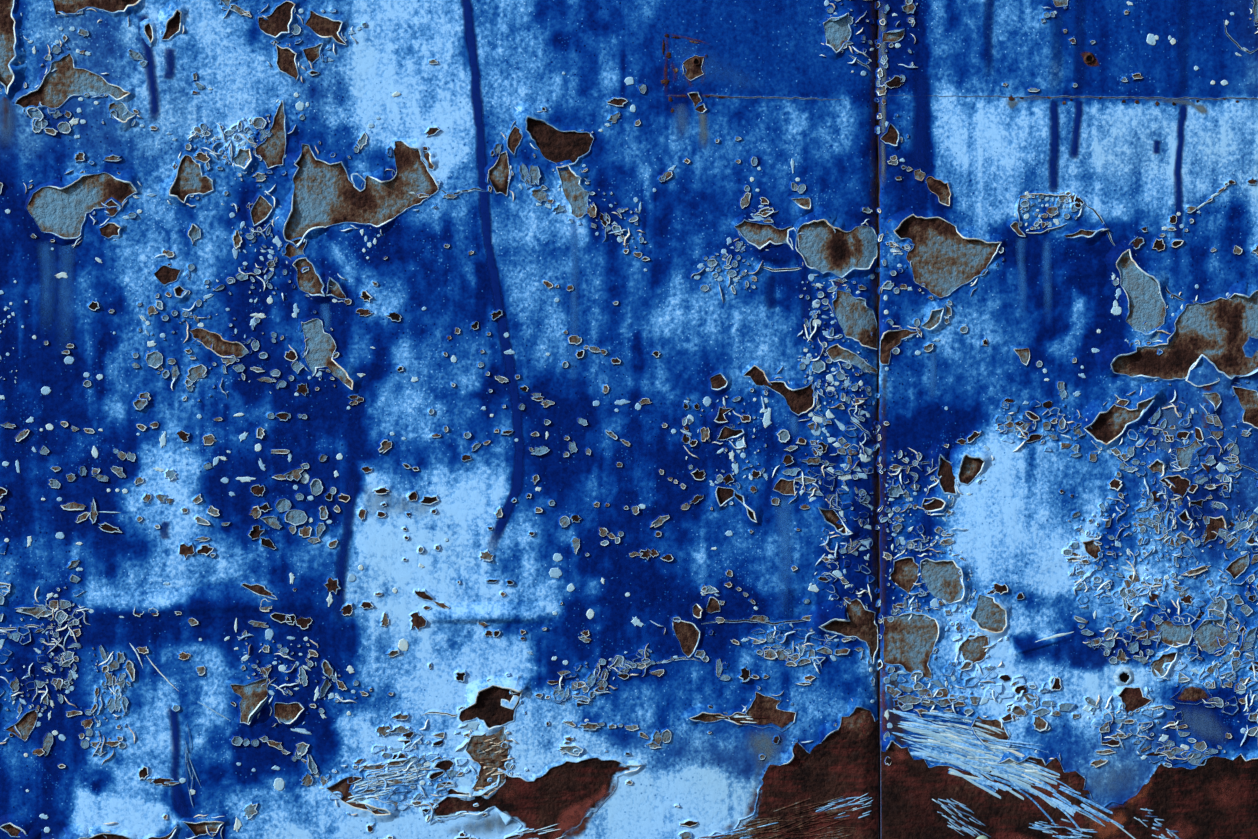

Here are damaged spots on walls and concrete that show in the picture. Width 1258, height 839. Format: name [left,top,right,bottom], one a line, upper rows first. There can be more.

peeling [819,0,918,105]
peeling [1039,0,1096,46]
peeling [1146,34,1176,45]
peeling [1225,0,1258,34]
peeling [680,53,710,114]
peeling [484,77,651,271]
peeling [0,0,471,560]
peeling [225,112,1258,839]
peeling [0,532,149,769]
peeling [137,764,195,795]
corrosion [561,786,615,839]
corrosion [718,791,861,839]